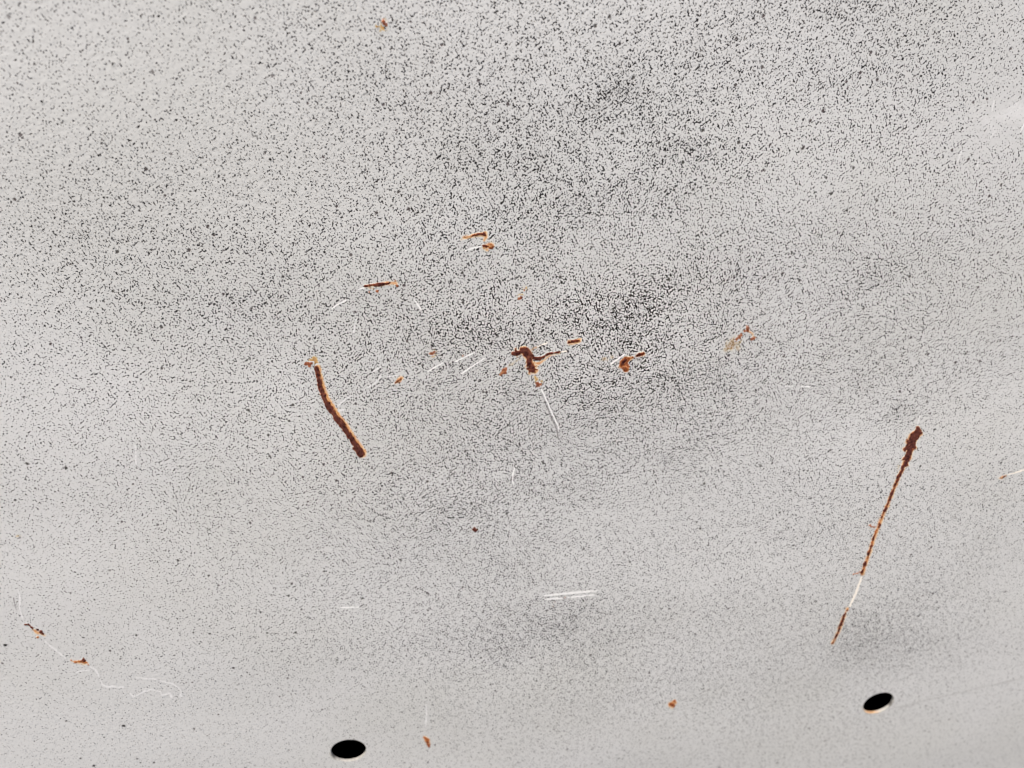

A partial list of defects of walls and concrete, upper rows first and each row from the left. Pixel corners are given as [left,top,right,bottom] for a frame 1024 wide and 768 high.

corrosion [460,230,496,253]
corrosion [363,279,400,294]
corrosion [498,337,583,389]
corrosion [600,349,648,374]
corrosion [303,361,368,459]
corrosion [859,425,924,577]